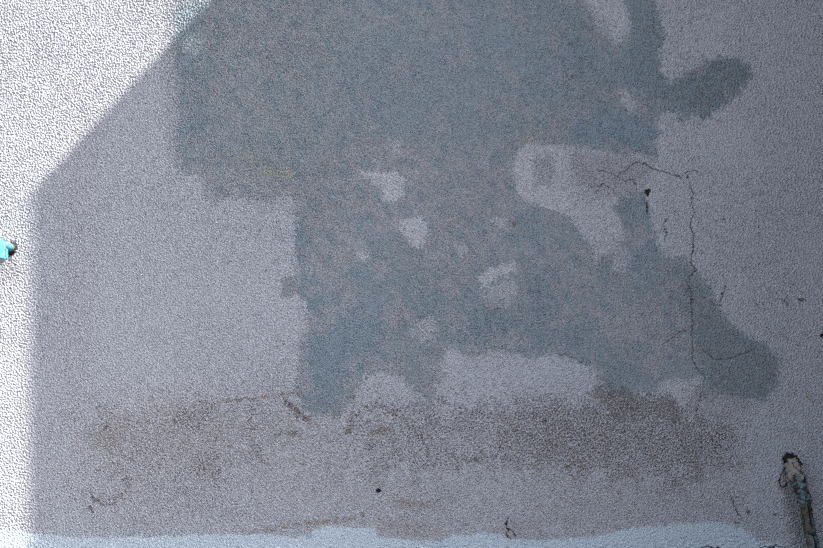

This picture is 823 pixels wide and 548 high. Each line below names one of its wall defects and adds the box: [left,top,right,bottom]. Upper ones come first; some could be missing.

crack [583,162,756,415]